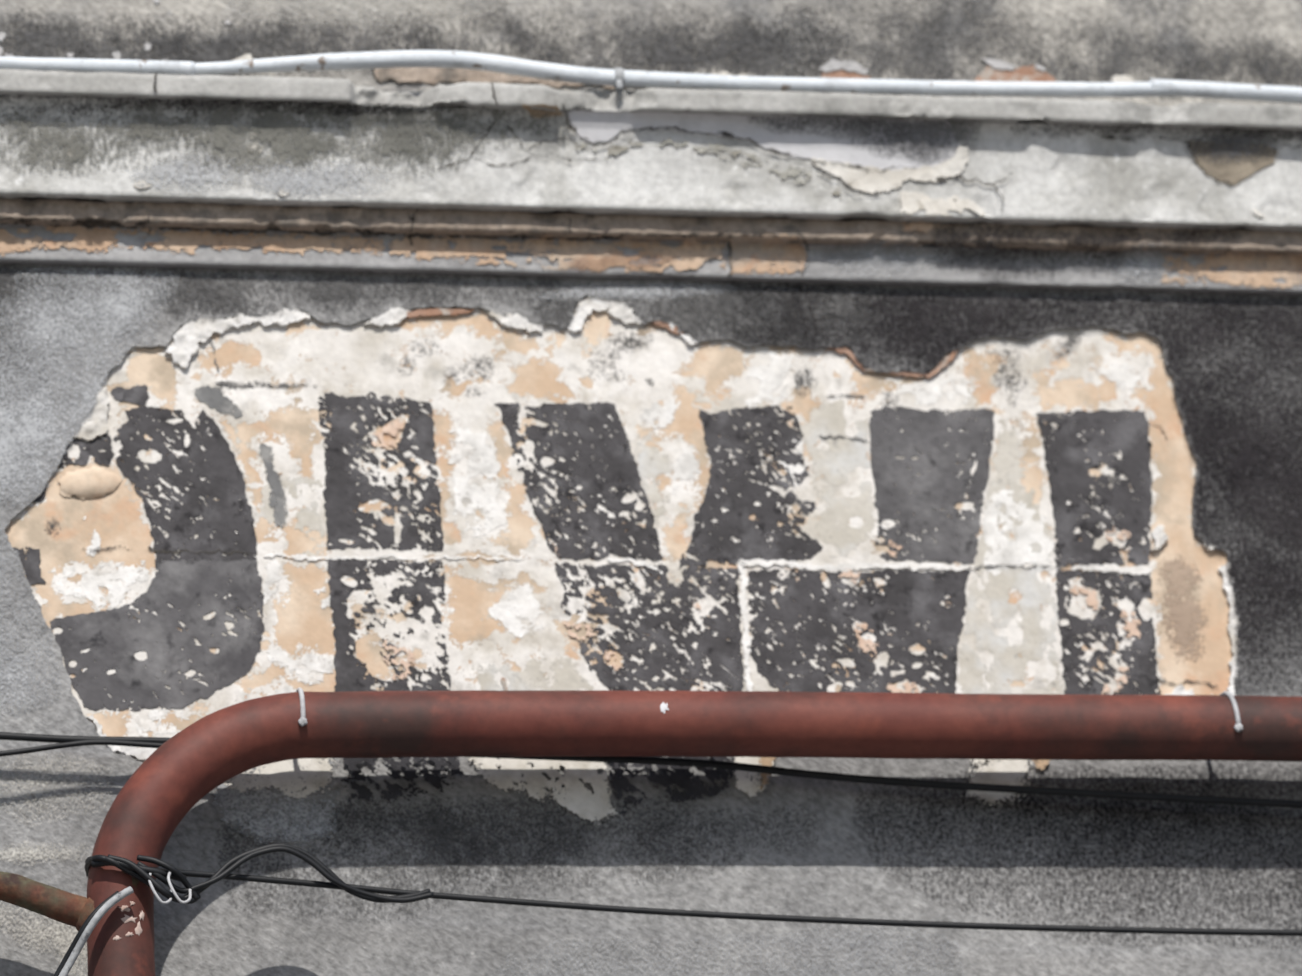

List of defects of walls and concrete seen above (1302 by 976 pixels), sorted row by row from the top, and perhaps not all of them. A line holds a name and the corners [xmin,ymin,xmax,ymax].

damp [0,0,1302,87]
flaking render [819,58,870,79]
flaking render [975,58,1057,82]
flaking render [521,104,985,218]
flaking render [1186,140,1278,186]
peeling [0,219,806,276]
peeling [1159,250,1302,289]
flaking render [5,294,1241,762]